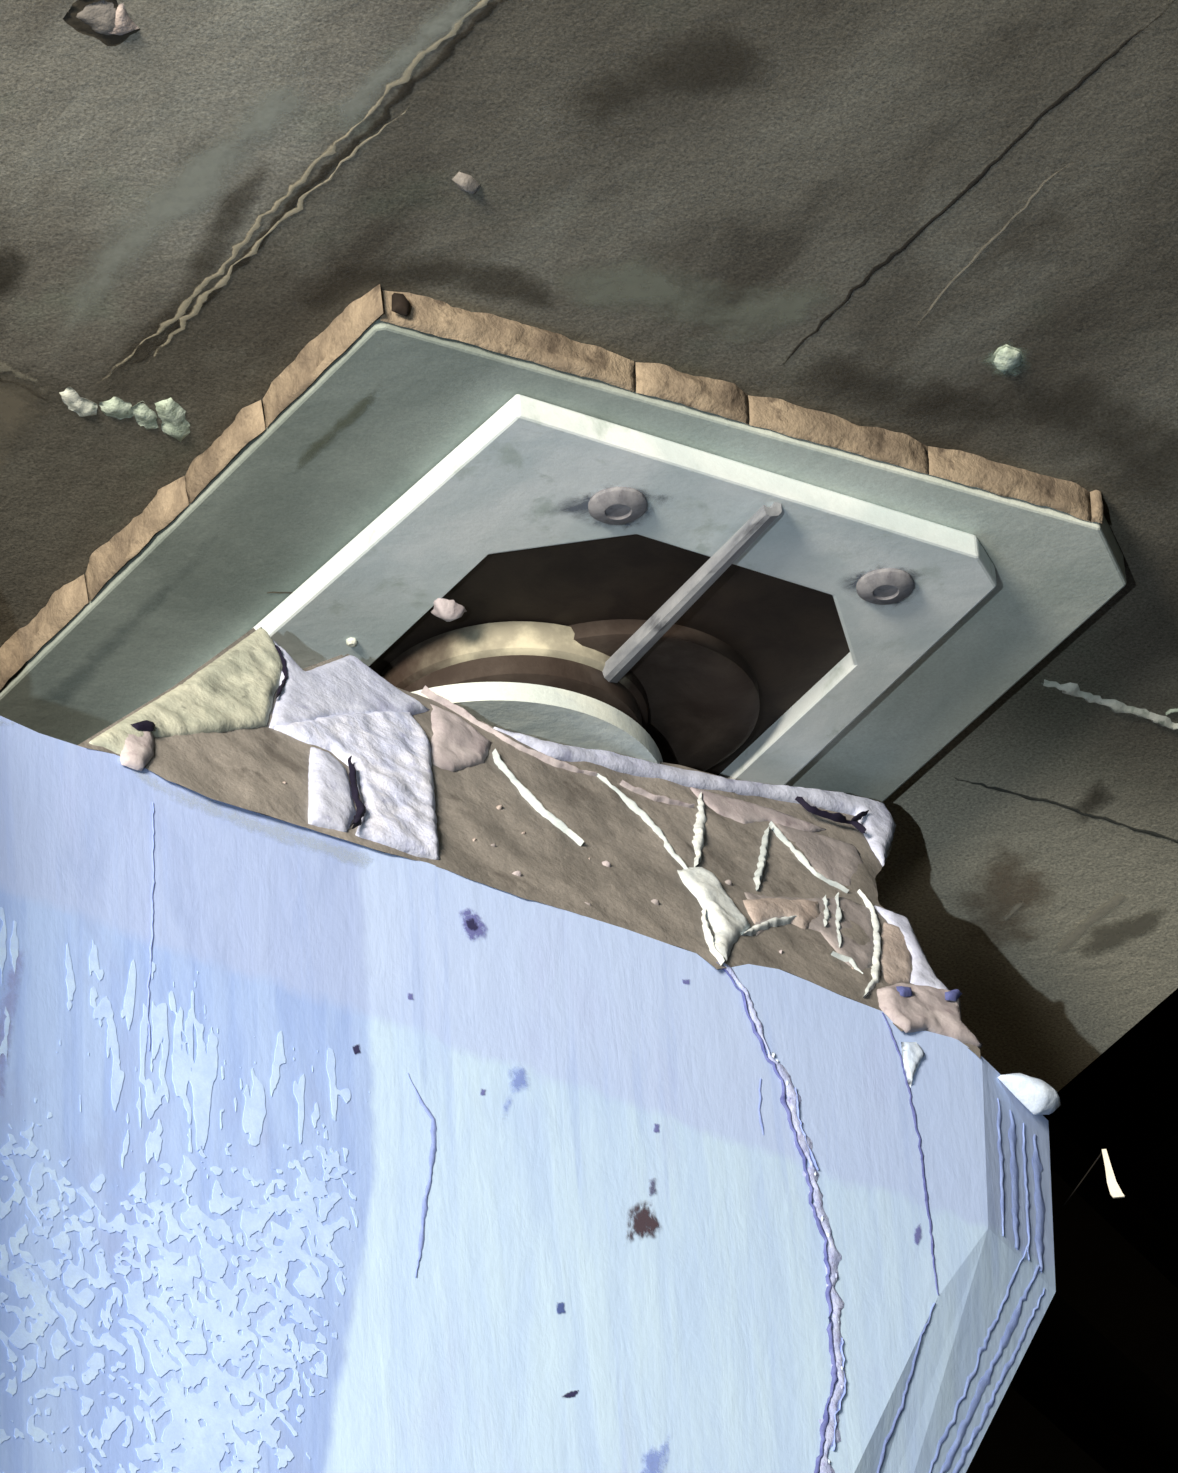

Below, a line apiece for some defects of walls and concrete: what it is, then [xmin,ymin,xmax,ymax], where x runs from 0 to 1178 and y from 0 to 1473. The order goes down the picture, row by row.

spalling [63,0,141,46]
crack [106,0,505,378]
crack [785,15,1161,362]
crack [0,362,43,398]
water stain [59,387,190,442]
spalling [78,627,983,1058]
crack [955,778,1178,843]
peeling [0,907,19,982]
water stain [463,909,486,939]
corrosion [628,1180,659,1239]
crack [716,962,847,1473]
crack [877,1013,939,1473]